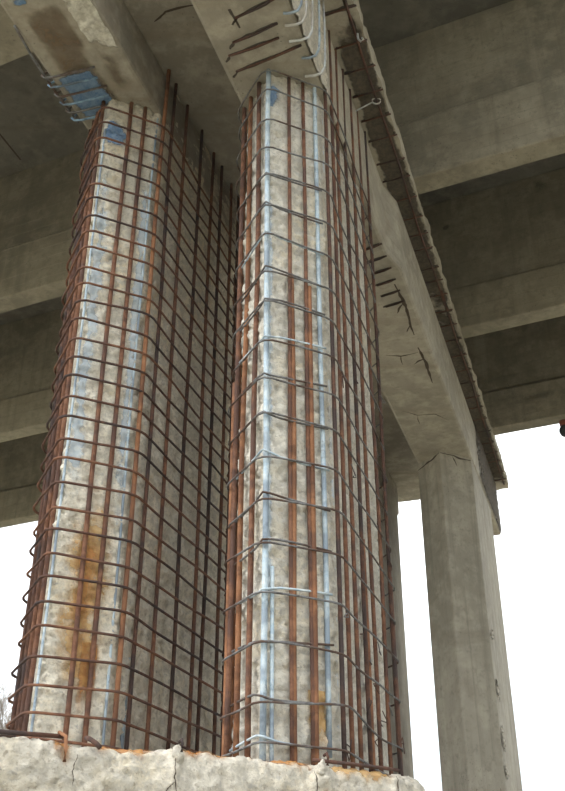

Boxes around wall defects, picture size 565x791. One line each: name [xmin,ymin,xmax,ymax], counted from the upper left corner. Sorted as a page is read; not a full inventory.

spalling [226,0,506,534]
crack [386,284,433,383]
crack [419,452,471,470]
corrosion [60,526,105,698]
spalling [84,735,102,750]
spalling [312,758,400,772]